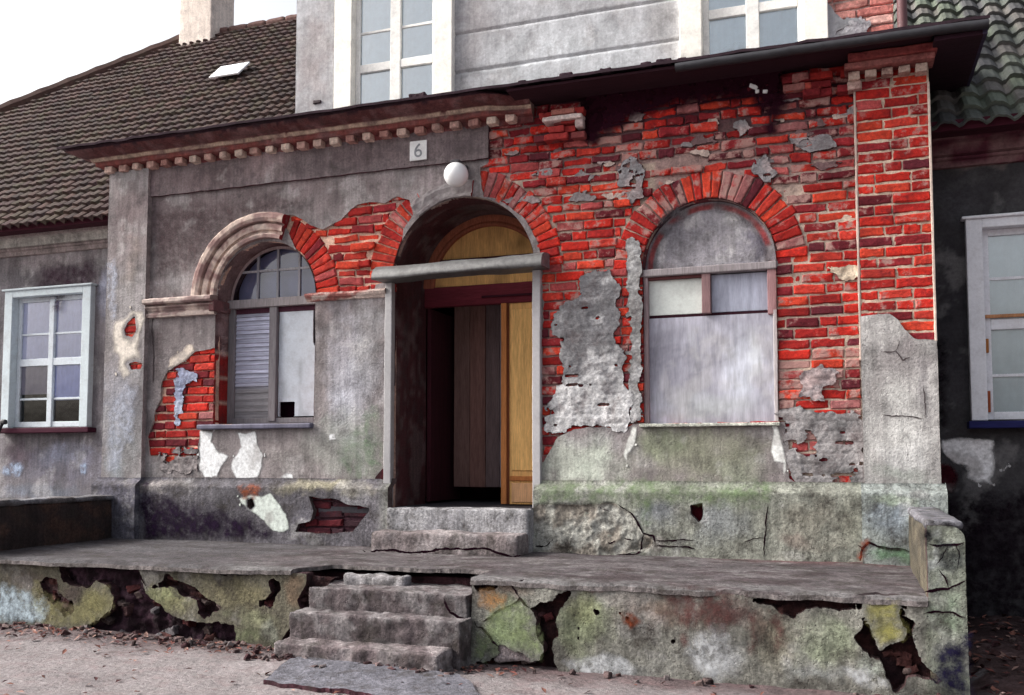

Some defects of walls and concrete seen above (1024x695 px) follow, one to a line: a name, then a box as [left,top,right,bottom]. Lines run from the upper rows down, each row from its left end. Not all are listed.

flaking render [286,194,419,293]
flaking render [478,65,937,482]
peeling [113,306,148,376]
flaking render [147,345,265,478]
peeling [942,439,1011,487]
flaking render [237,494,367,534]
crack [595,503,695,555]
spalling [39,566,236,642]
spalling [259,578,281,608]
spalling [476,590,572,668]
spalling [752,598,942,693]
crack [856,541,967,618]